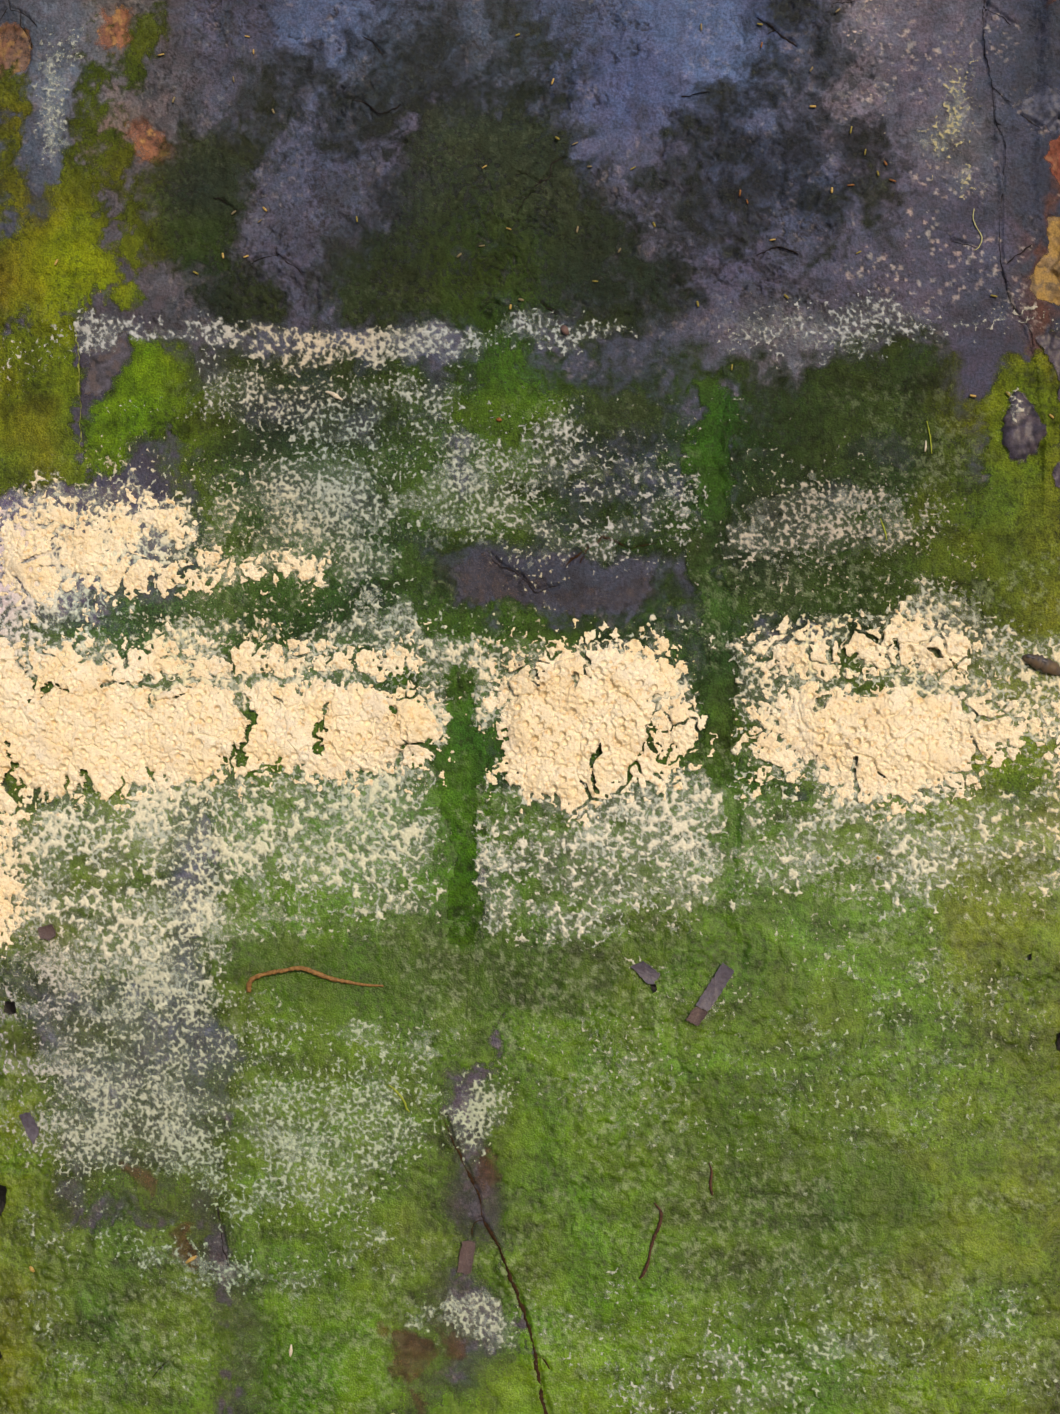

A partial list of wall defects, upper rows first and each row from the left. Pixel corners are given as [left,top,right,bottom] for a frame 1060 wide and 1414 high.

leakage [32,29,81,162]
leakage [922,61,974,199]
crack [953,0,1041,339]
peeling [1014,82,1060,186]
spalling [1029,216,1060,306]
leakage [718,290,955,356]
peeling [1035,330,1060,402]
peeling [1052,462,1060,488]
leakage [0,308,1060,1297]
leakage [405,1293,517,1351]
leakage [596,1270,954,1414]
leakage [947,1288,1027,1352]